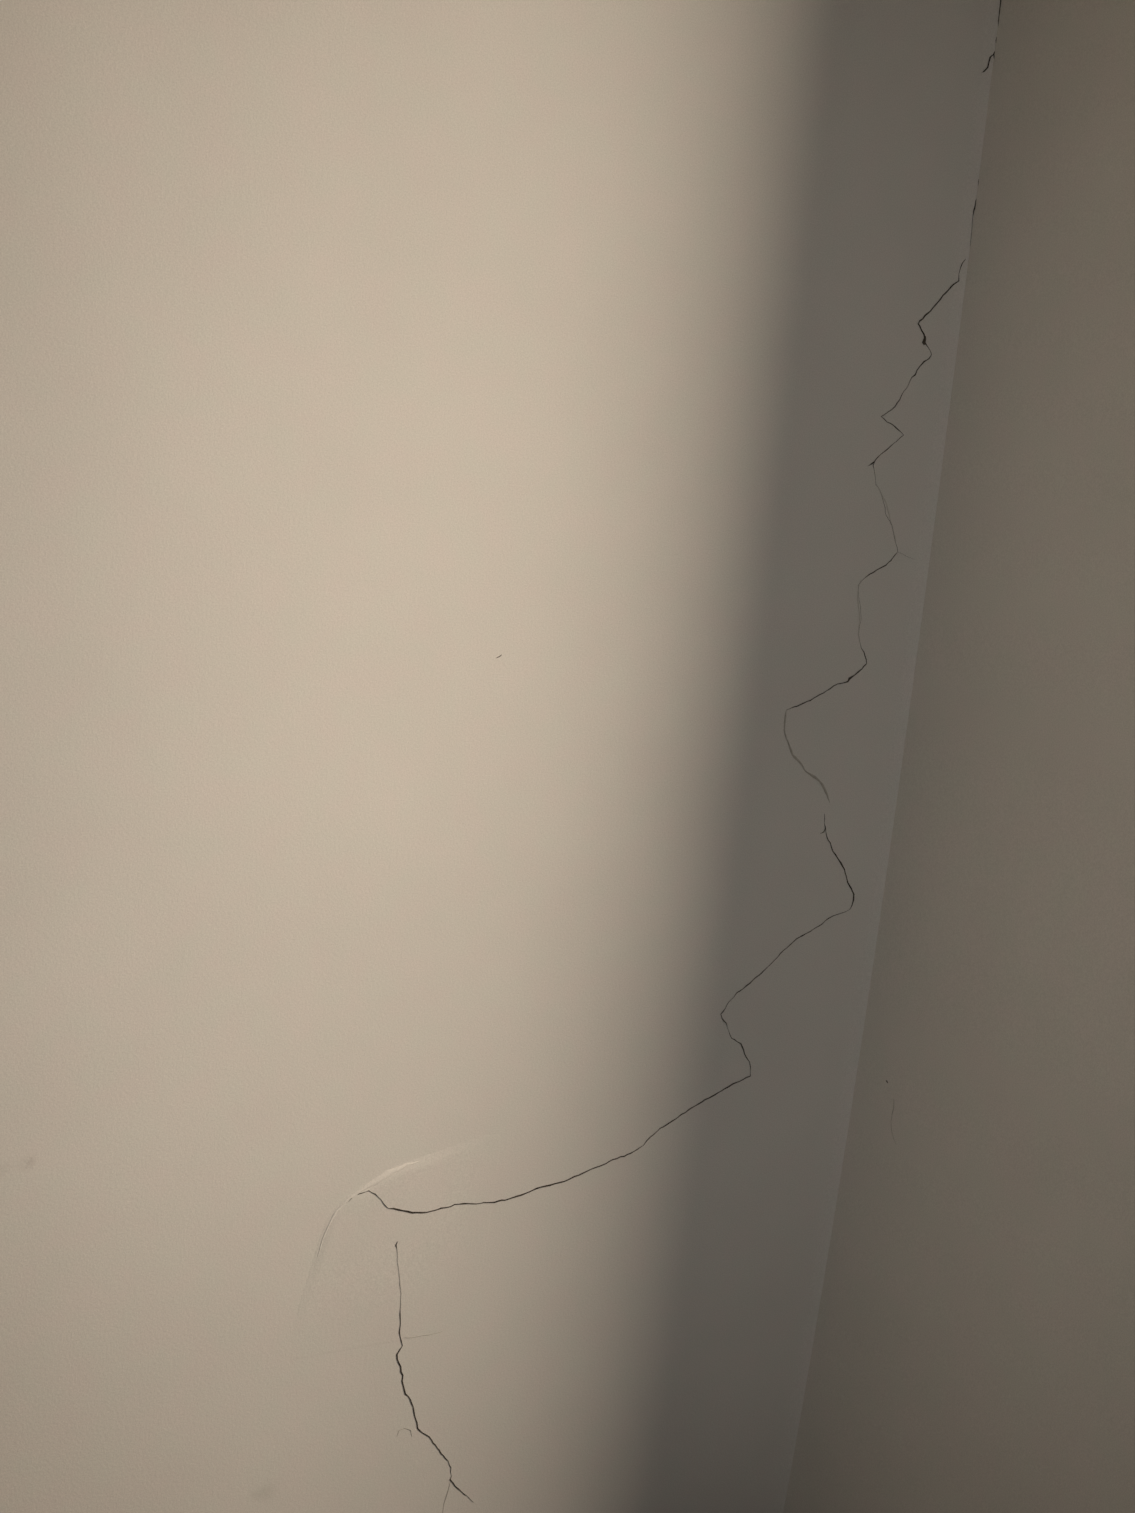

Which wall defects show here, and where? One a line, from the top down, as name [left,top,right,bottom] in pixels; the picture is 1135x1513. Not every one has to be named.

crack [983,0,1001,72]
crack [350,180,979,1509]